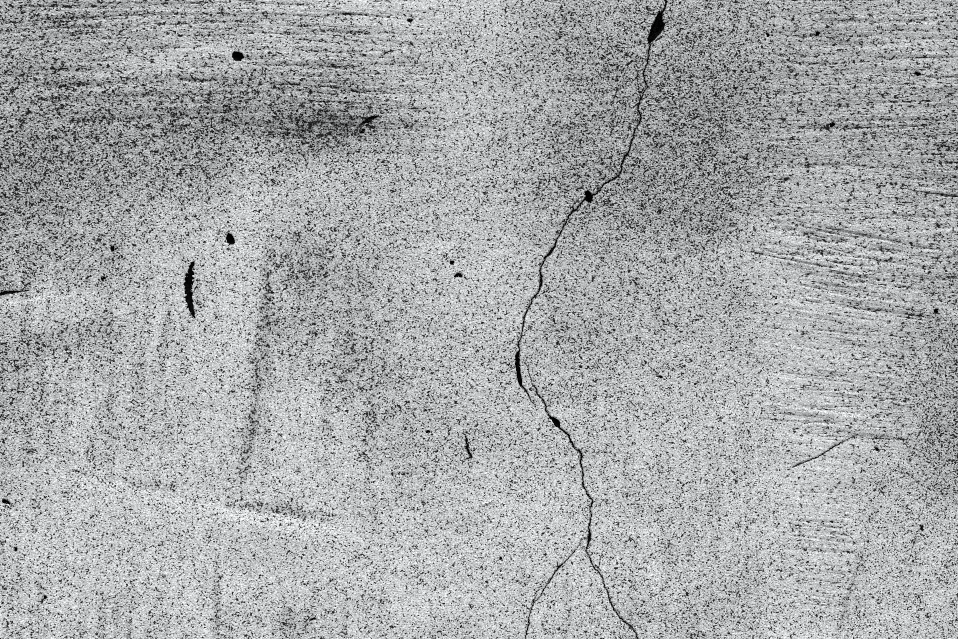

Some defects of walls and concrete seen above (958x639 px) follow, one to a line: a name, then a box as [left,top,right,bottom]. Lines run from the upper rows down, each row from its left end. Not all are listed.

crack [517,0,667,639]